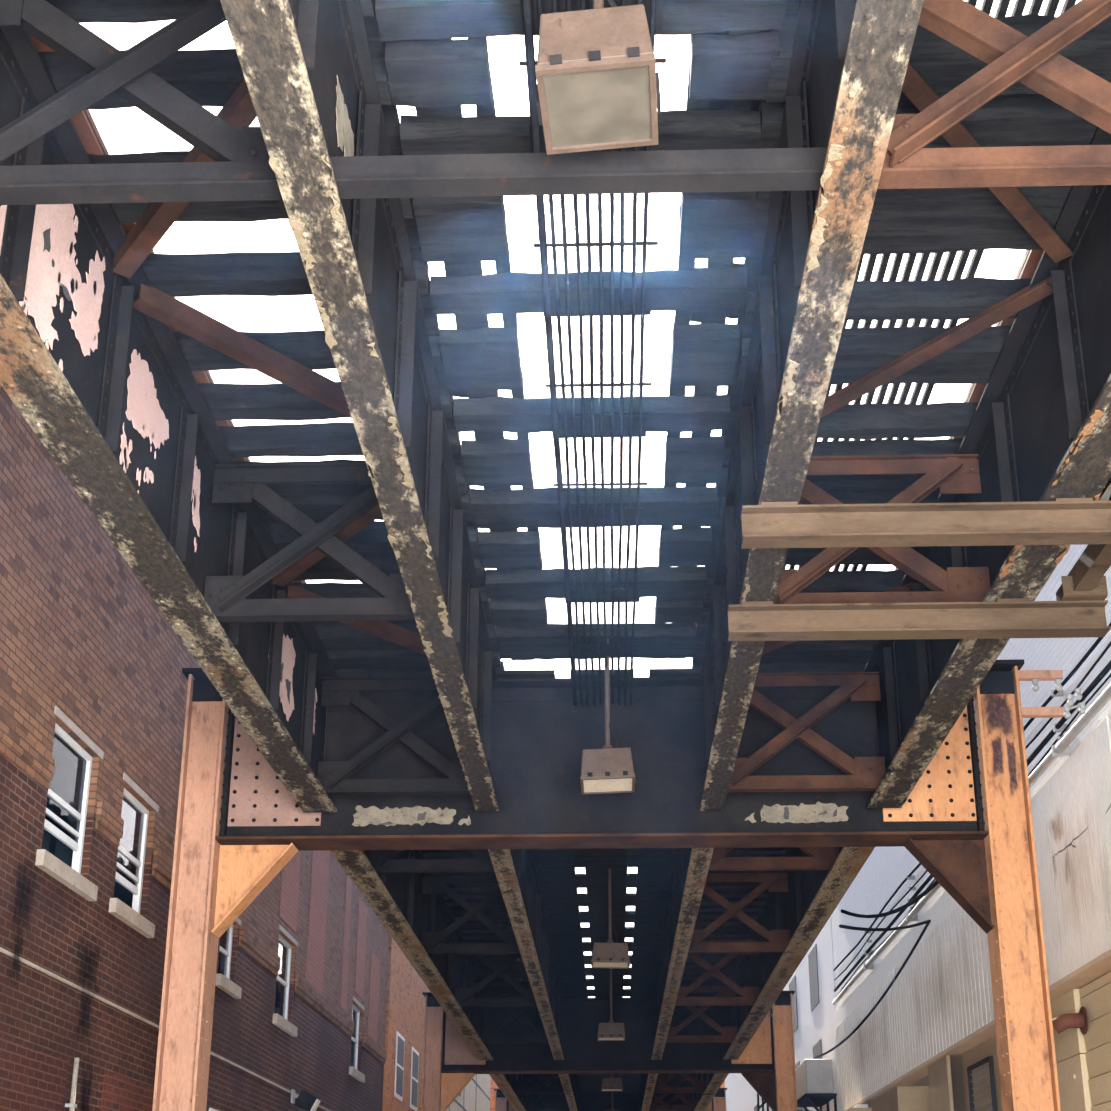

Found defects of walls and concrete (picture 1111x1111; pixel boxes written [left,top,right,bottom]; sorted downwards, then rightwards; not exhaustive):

peeling [19,204,105,371]
peeling [120,349,169,494]
corrosion [1052,410,1104,486]
corrosion [1094,478,1111,501]
corrosion [999,545,1023,577]
peeling [214,625,235,654]
peeling [242,634,296,733]
corrosion [985,694,1017,794]
peeling [292,747,334,809]
peeling [352,805,471,826]
peeling [744,801,849,823]